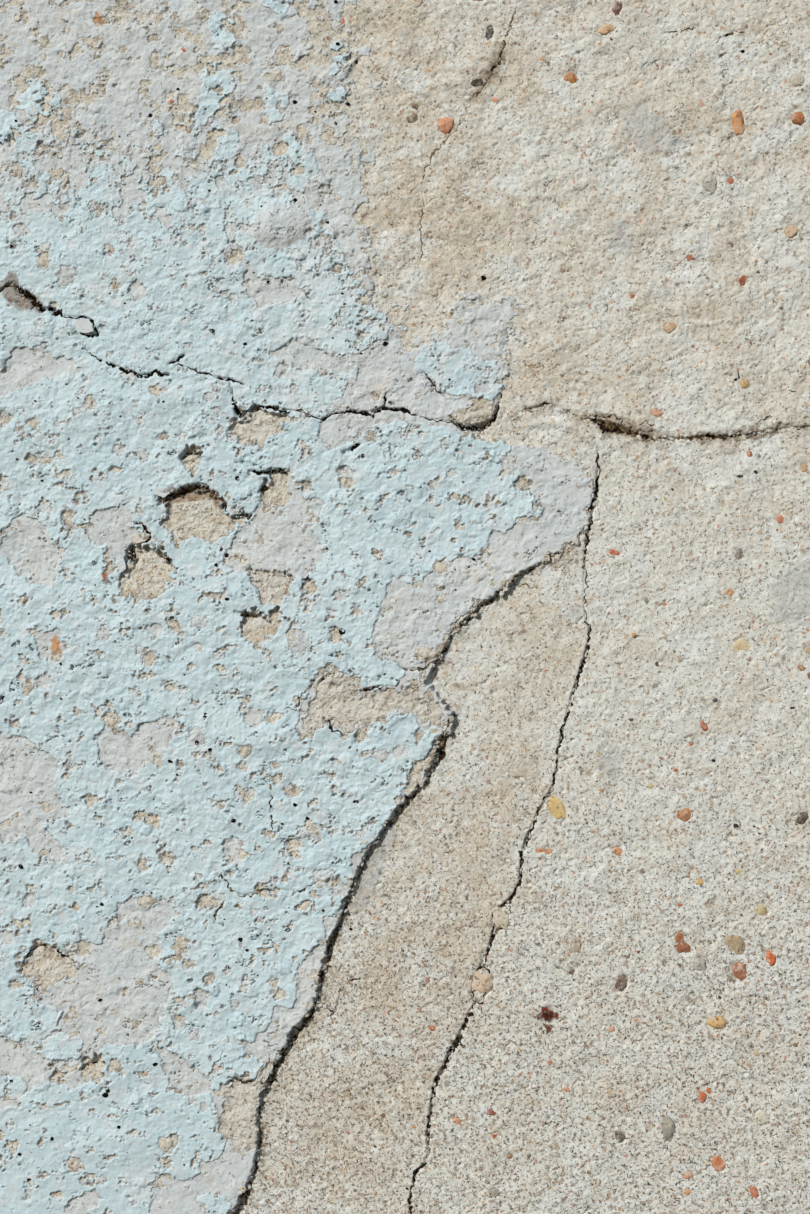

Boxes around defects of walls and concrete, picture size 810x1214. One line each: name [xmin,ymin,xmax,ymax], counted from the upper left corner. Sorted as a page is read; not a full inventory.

peeling [239,259,311,308]
peeling [0,342,82,396]
spalling [228,404,290,451]
peeling [0,513,64,587]
peeling [81,445,328,649]
peeling [269,288,595,804]
peeling [31,626,69,664]
peeling [94,715,183,778]
crack [0,285,810,1214]
peeling [0,732,74,865]
peeling [0,896,274,1214]